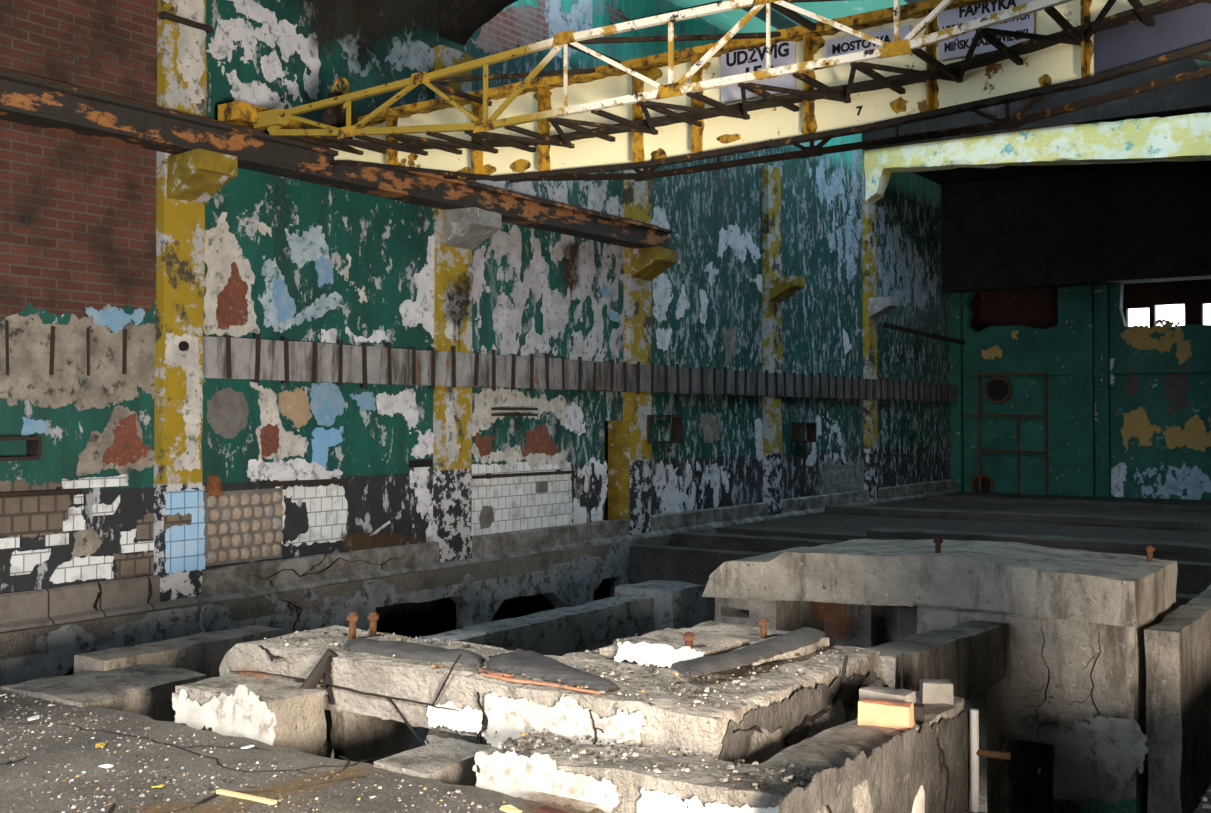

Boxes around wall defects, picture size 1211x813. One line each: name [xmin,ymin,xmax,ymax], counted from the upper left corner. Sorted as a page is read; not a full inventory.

flaking render [0,0,321,110]
corrosion [645,68,663,81]
corrosion [1038,74,1052,87]
corrosion [890,96,908,114]
corrosion [716,134,741,144]
corrosion [650,148,667,161]
corrosion [457,159,531,180]
flaking render [0,119,388,476]
peeling [399,224,624,362]
peeling [586,641,704,668]
peeling [409,692,646,813]
peeling [637,710,970,813]